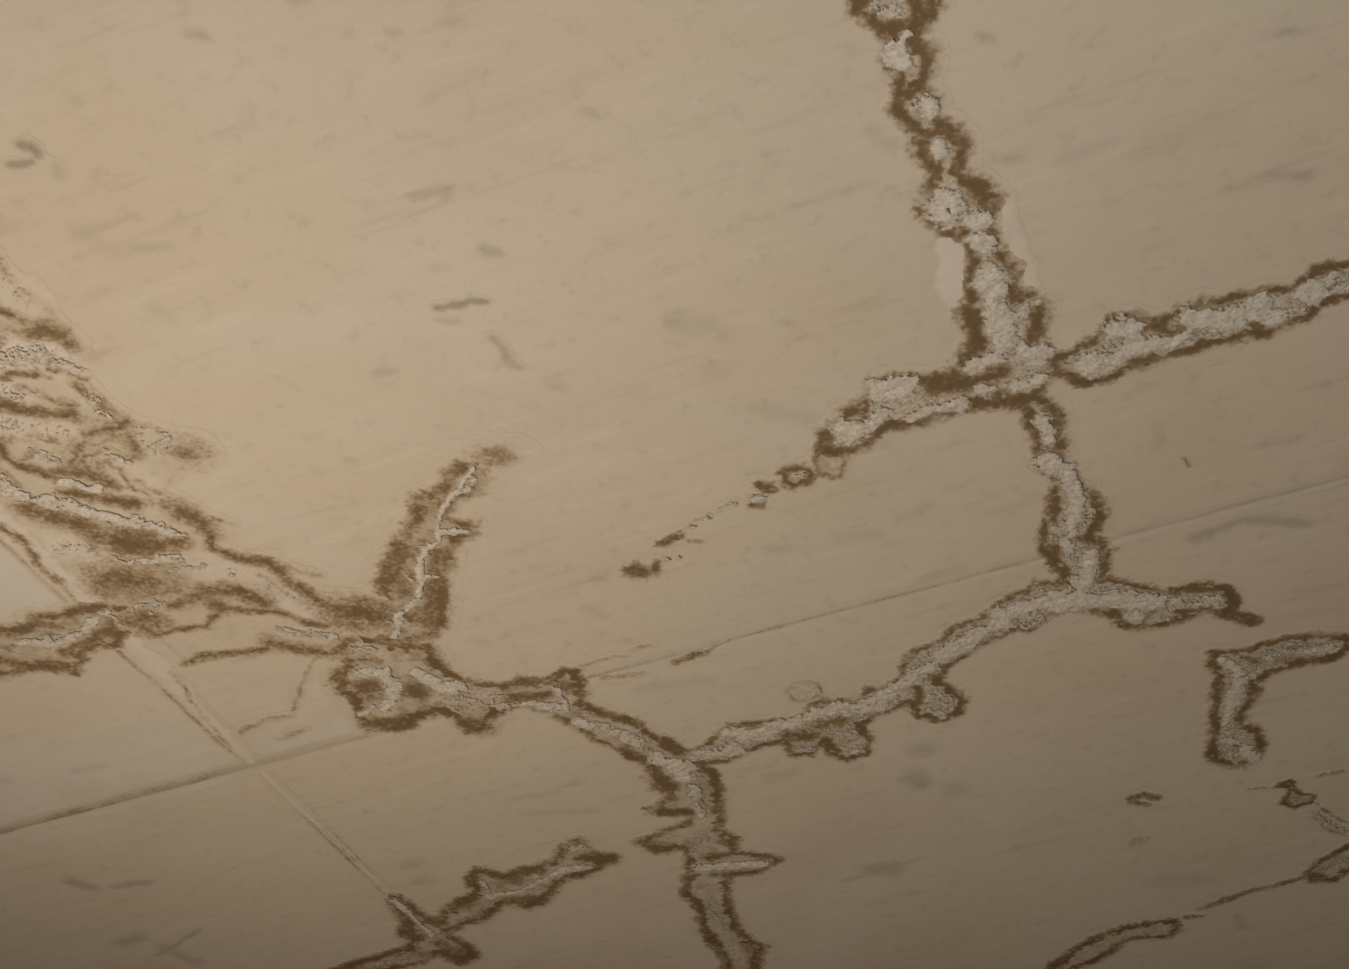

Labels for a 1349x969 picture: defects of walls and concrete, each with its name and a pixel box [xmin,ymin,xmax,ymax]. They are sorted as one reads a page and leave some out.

crack [312,0,1349,969]
damp [1179,510,1317,548]
crack [0,601,133,685]